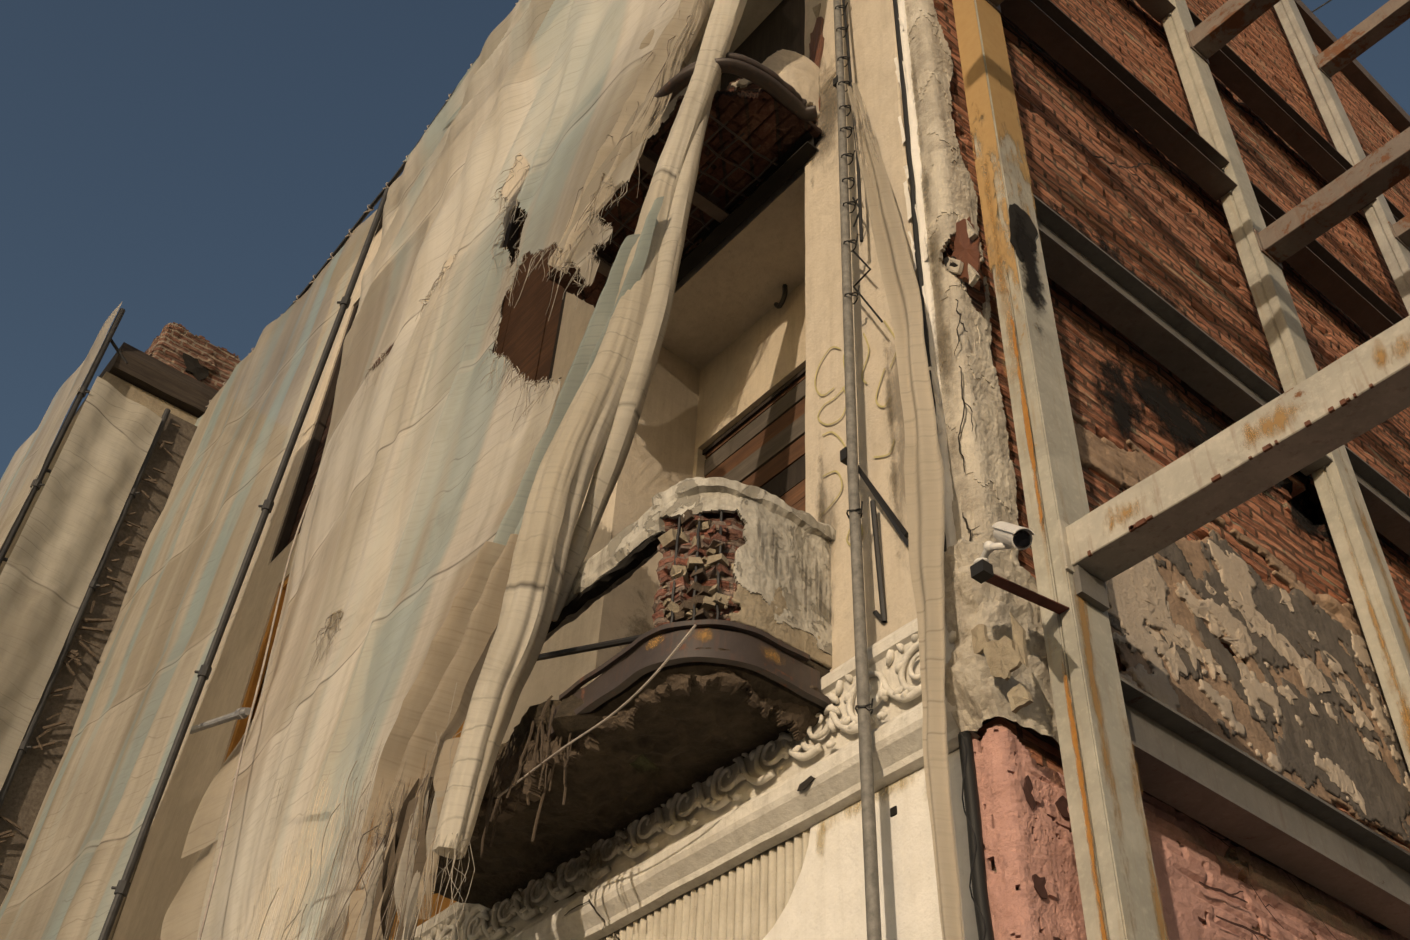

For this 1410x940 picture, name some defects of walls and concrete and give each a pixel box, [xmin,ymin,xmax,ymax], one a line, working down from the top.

peeling [894,0,981,316]
corrosion [952,0,1044,530]
flaking render [658,509,731,622]
crack [954,299,973,472]
peeling [929,311,1011,513]
crack [962,512,979,542]
peeling [1071,408,1164,489]
corrosion [1246,408,1292,440]
corrosion [1062,664,1106,940]
corrosion [1078,596,1120,815]
corrosion [1145,829,1168,940]
peeling [1106,516,1410,847]